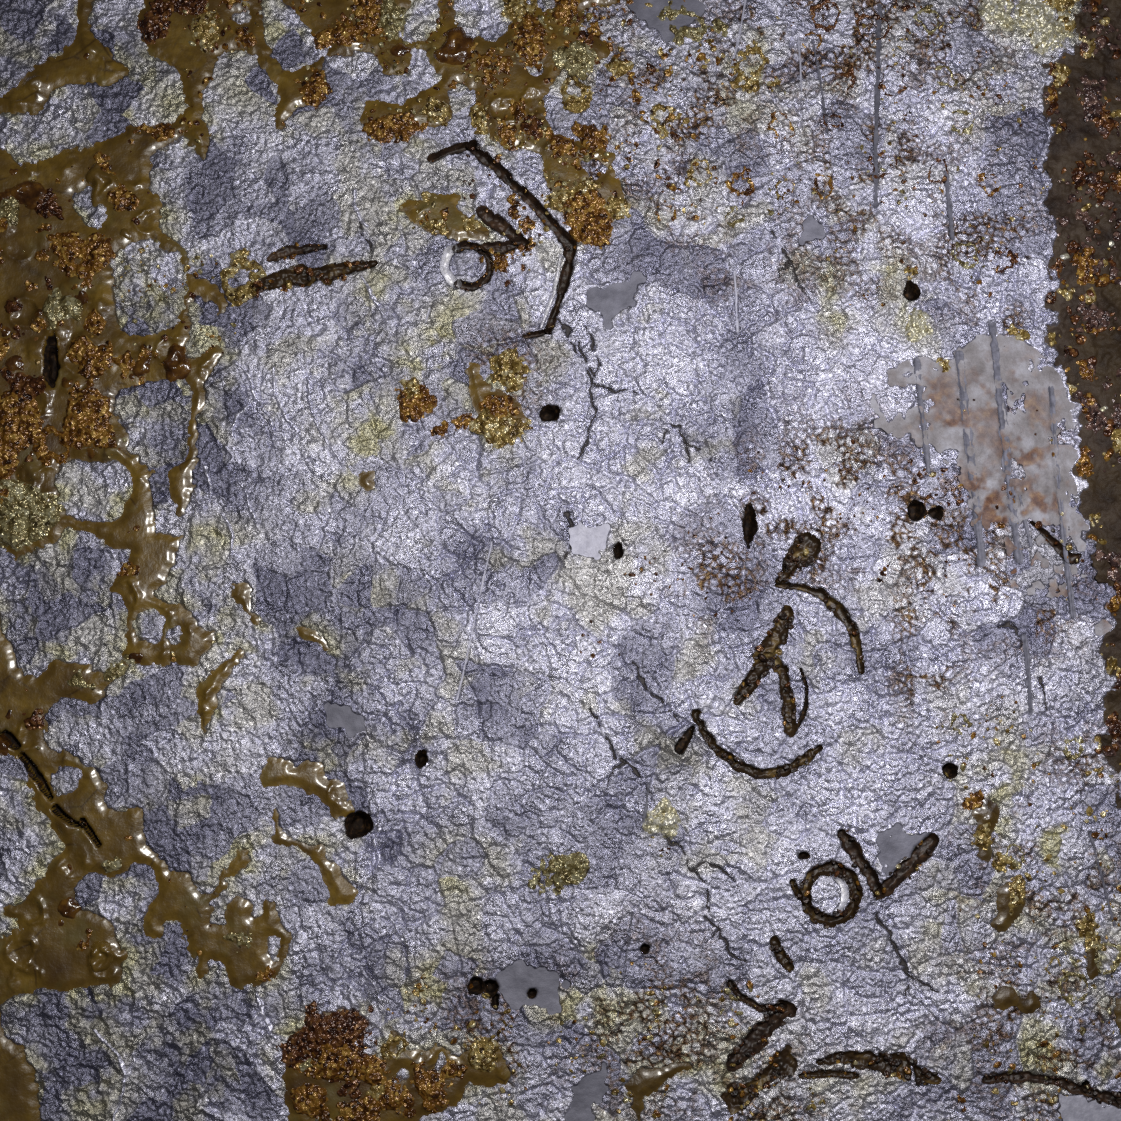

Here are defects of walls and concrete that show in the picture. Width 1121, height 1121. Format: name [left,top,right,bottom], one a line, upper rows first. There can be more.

peeling [587,271,646,329]
spalling [43,334,61,388]
hole [539,404,560,421]
corrosion [748,439,857,502]
peeling [568,522,623,560]
spalling [415,750,428,768]
hole [344,811,374,839]
peeling [467,960,570,1015]
peeling [565,1063,608,1121]
peeling [1049,1080,1121,1121]